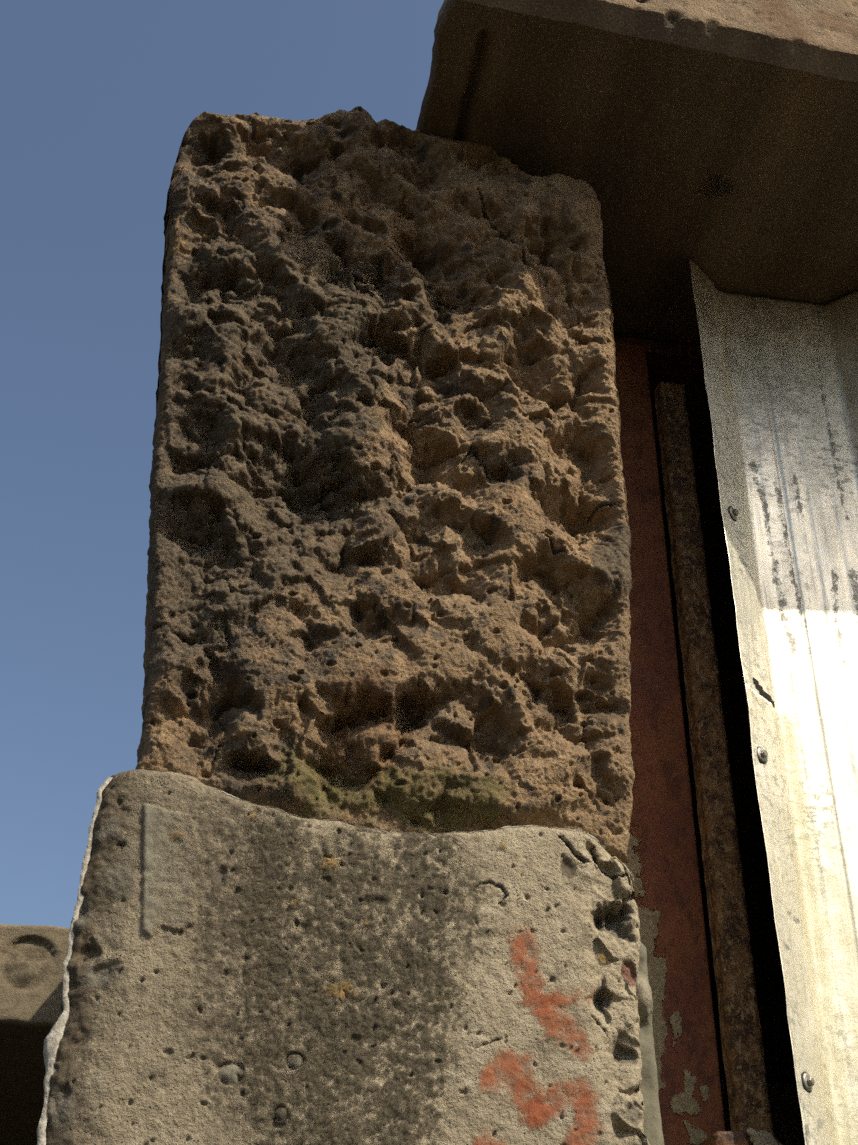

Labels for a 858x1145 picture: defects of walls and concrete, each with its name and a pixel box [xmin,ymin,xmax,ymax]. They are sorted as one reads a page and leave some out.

damp [169,800,491,1145]
crack [558,836,632,889]
peeling [594,832,709,1145]